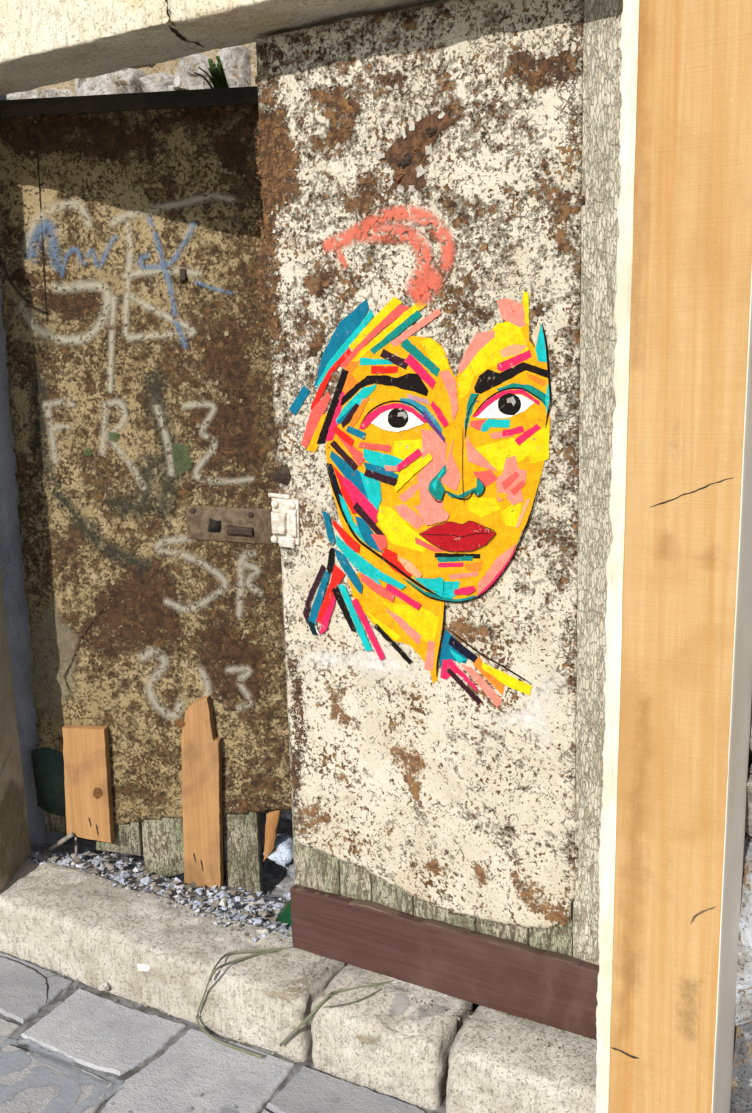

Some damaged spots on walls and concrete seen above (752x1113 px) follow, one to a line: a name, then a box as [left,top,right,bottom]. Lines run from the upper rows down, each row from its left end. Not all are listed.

crack [165,0,205,48]
crack [650,478,732,508]
rust [389,745,426,809]
rust [510,855,571,926]